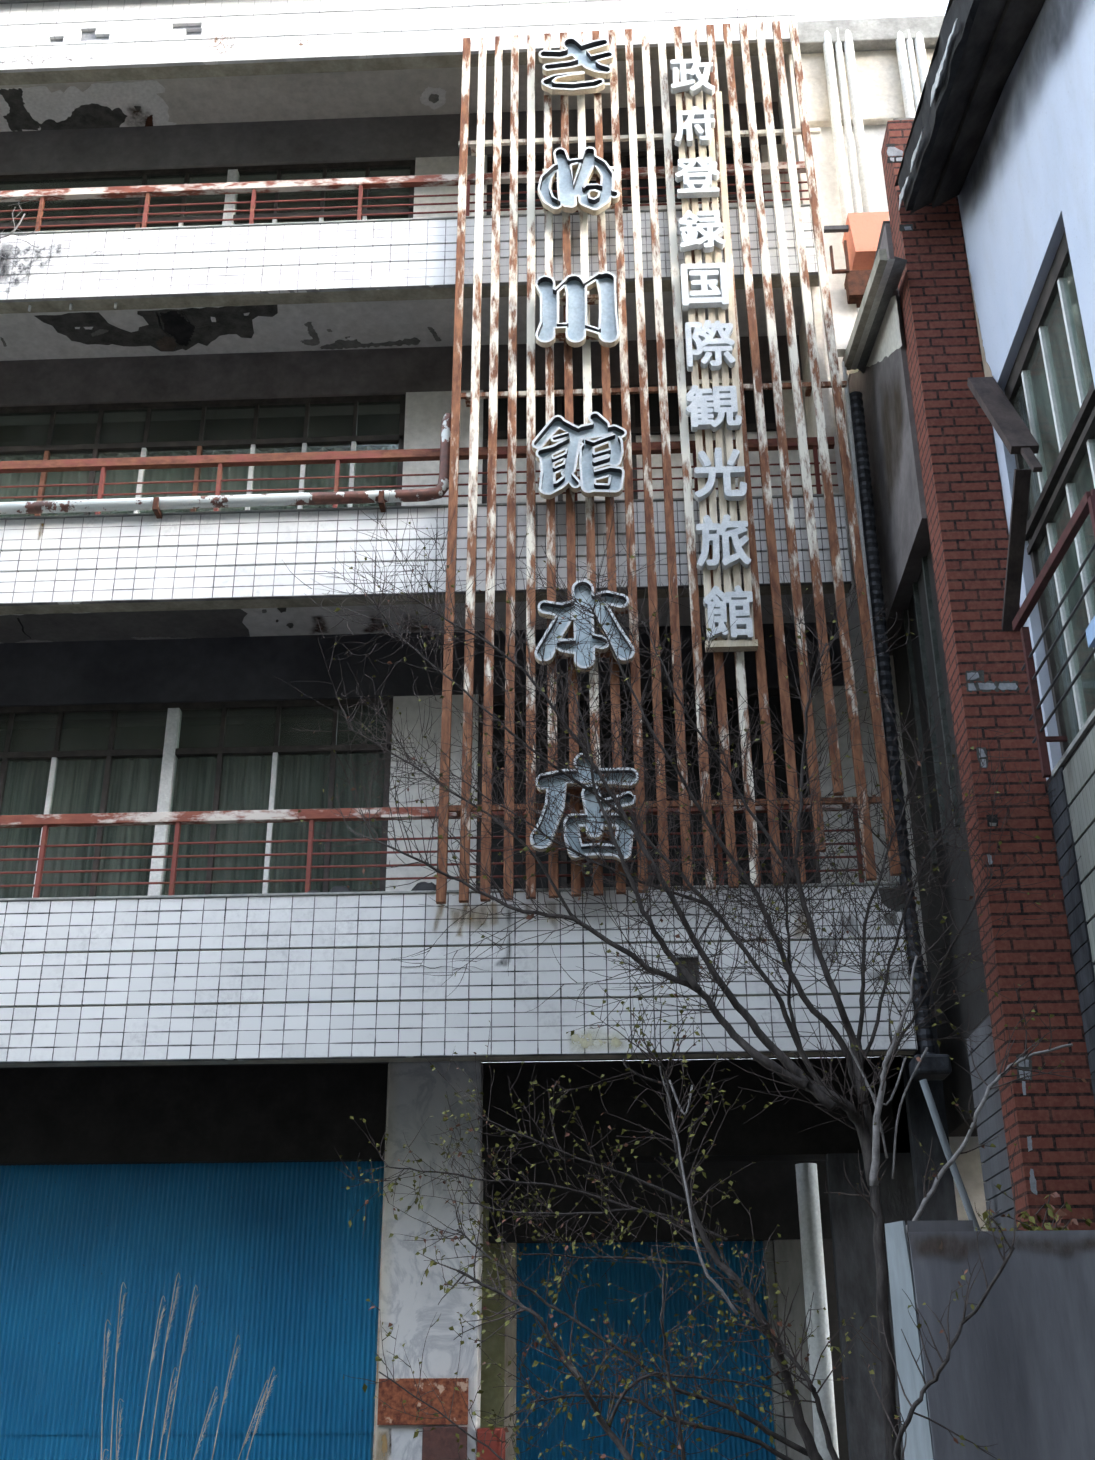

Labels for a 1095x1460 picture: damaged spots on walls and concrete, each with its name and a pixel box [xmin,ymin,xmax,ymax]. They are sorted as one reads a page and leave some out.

peeling [0,80,176,132]
spalling [35,305,278,352]
rust [372,1421,391,1460]